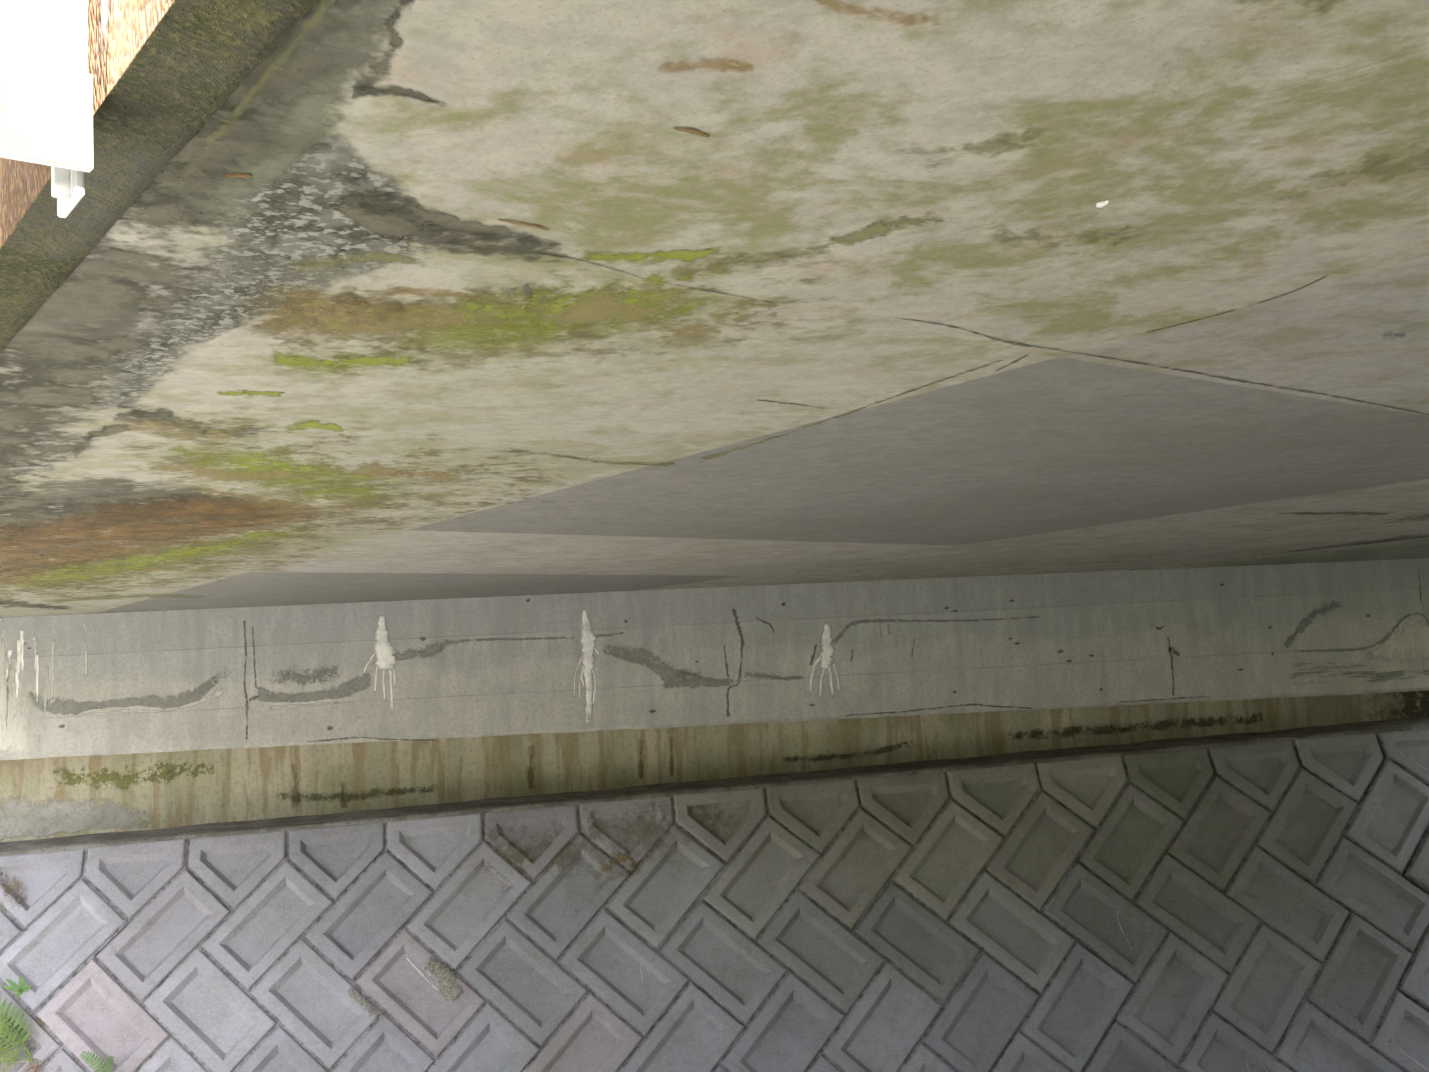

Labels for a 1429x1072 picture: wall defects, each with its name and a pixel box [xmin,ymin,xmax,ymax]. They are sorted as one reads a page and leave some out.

leakage [0,0,560,609]
leakage [0,628,223,752]
crack [244,621,259,739]
leakage [258,616,564,711]
crack [724,608,774,716]
leakage [574,610,1016,719]
leakage [786,741,911,762]
leakage [1014,714,1262,739]
leakage [0,797,148,840]